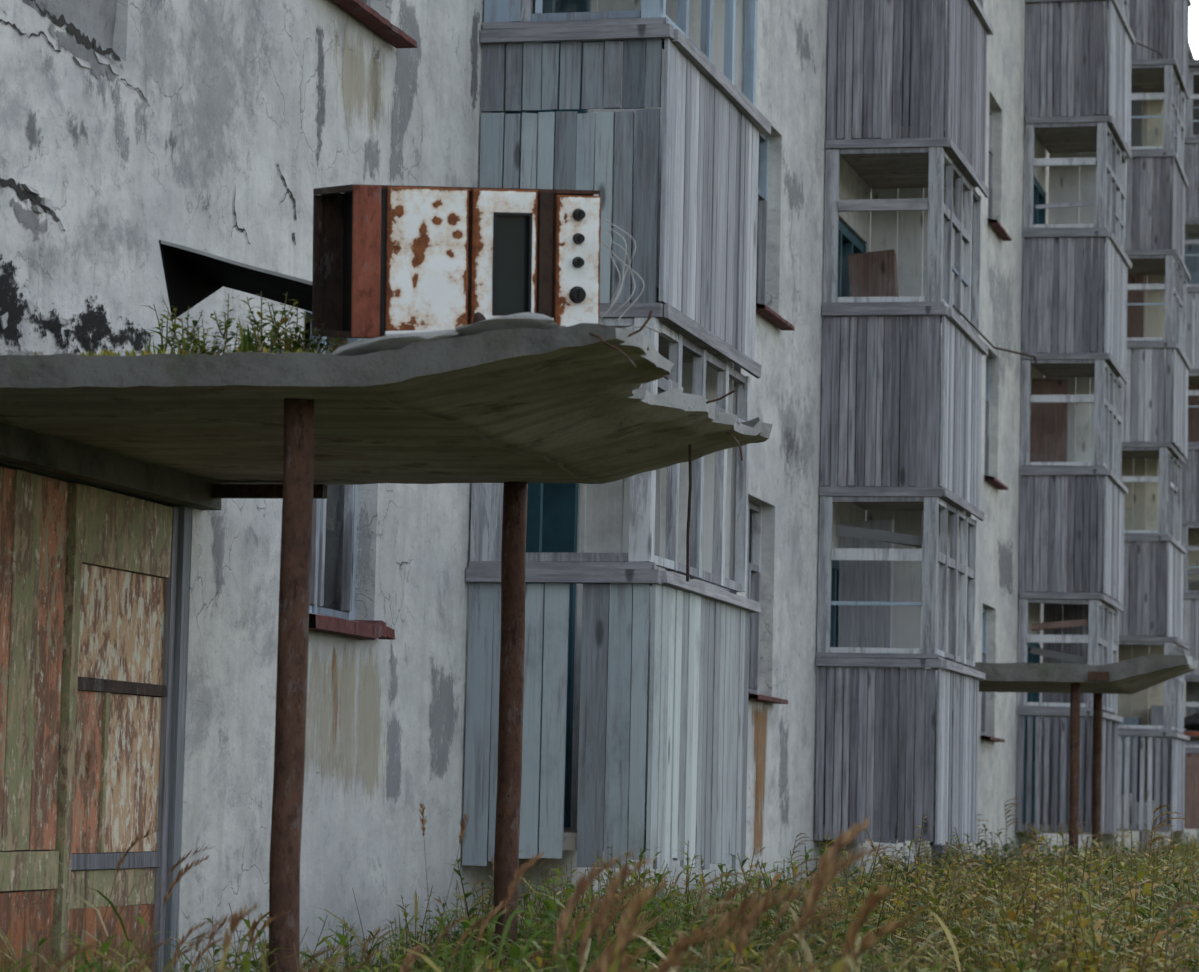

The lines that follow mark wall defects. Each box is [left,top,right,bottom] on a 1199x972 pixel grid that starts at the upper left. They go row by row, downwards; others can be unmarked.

crack [0,7,61,52]
crack [0,178,65,241]
spalling [589,310,652,368]
damp [430,659,459,779]
corrosion [752,703,767,856]